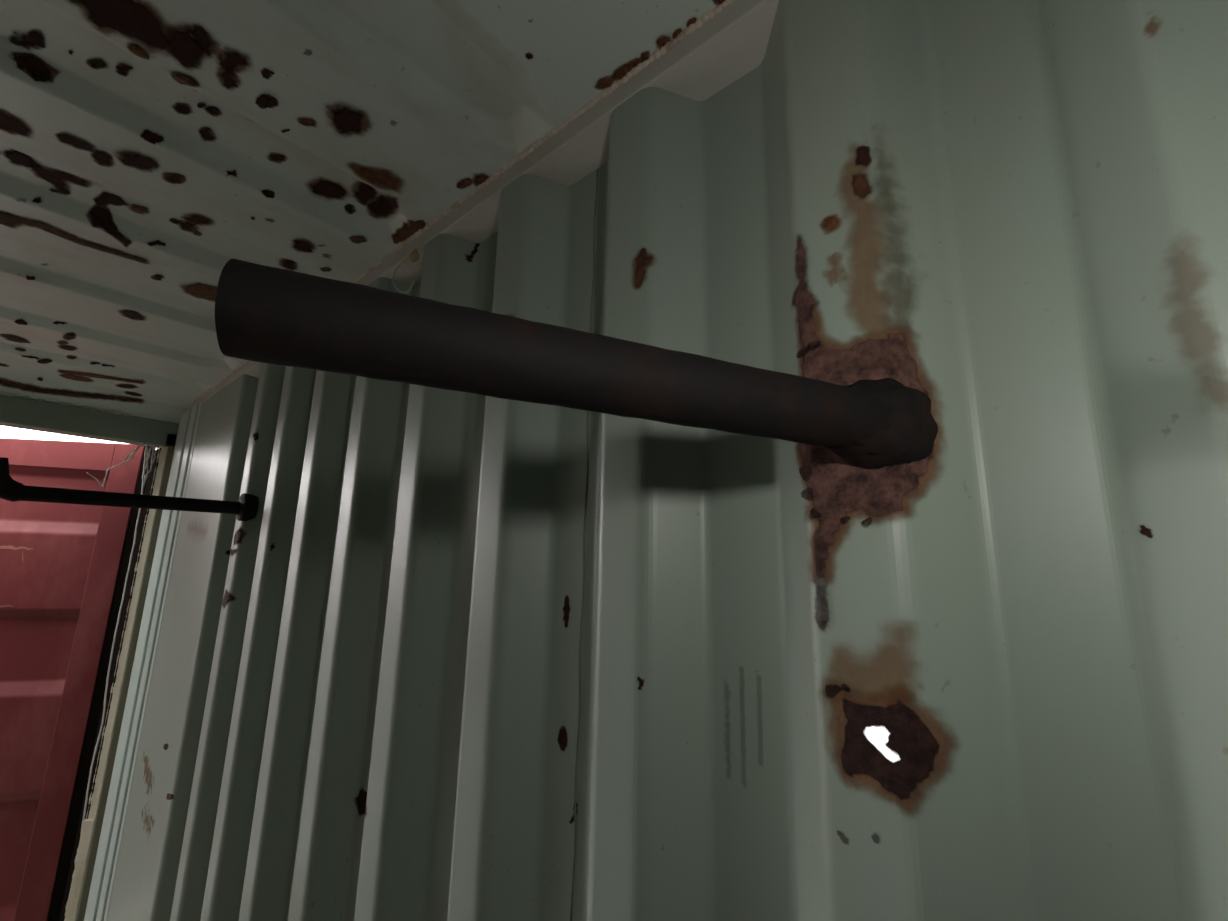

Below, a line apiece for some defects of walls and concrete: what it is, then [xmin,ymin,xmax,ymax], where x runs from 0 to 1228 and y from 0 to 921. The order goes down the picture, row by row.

corrosion [595,17,697,90]
corrosion [457,173,489,189]
corrosion [792,146,942,630]
corrosion [557,726,567,751]
corrosion [826,647,953,813]